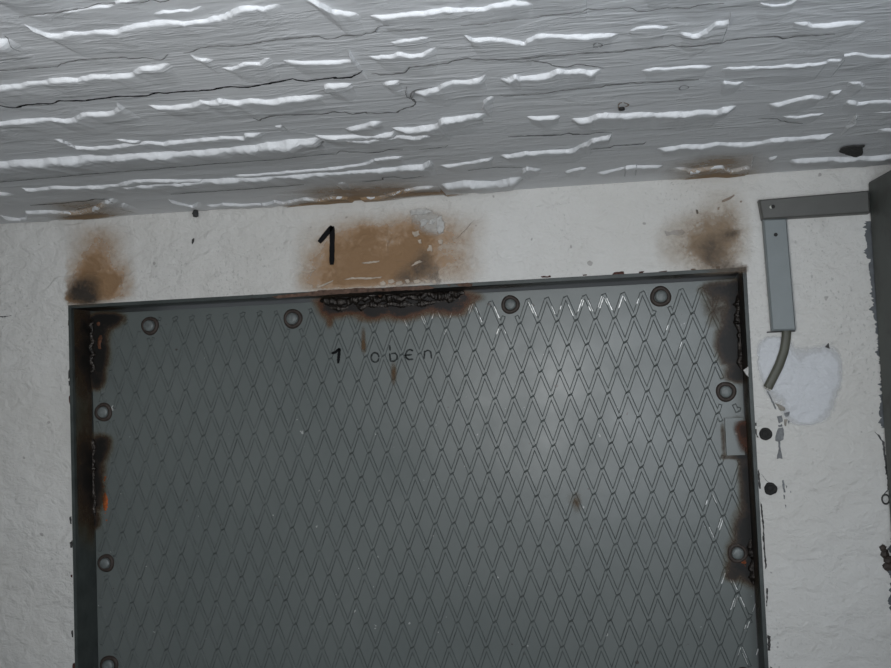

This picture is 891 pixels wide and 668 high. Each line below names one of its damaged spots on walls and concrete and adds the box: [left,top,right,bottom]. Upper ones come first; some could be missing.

crack [19,0,169,17]
crack [461,3,724,26]
crack [0,25,433,71]
crack [0,34,835,121]
crack [3,145,448,182]
crack [508,132,646,150]
peeling [839,145,865,157]
crack [30,198,112,206]
corrosion [682,195,746,272]
corrosion [65,237,124,305]
corrosion [272,219,460,298]
corrosion [735,421,747,452]